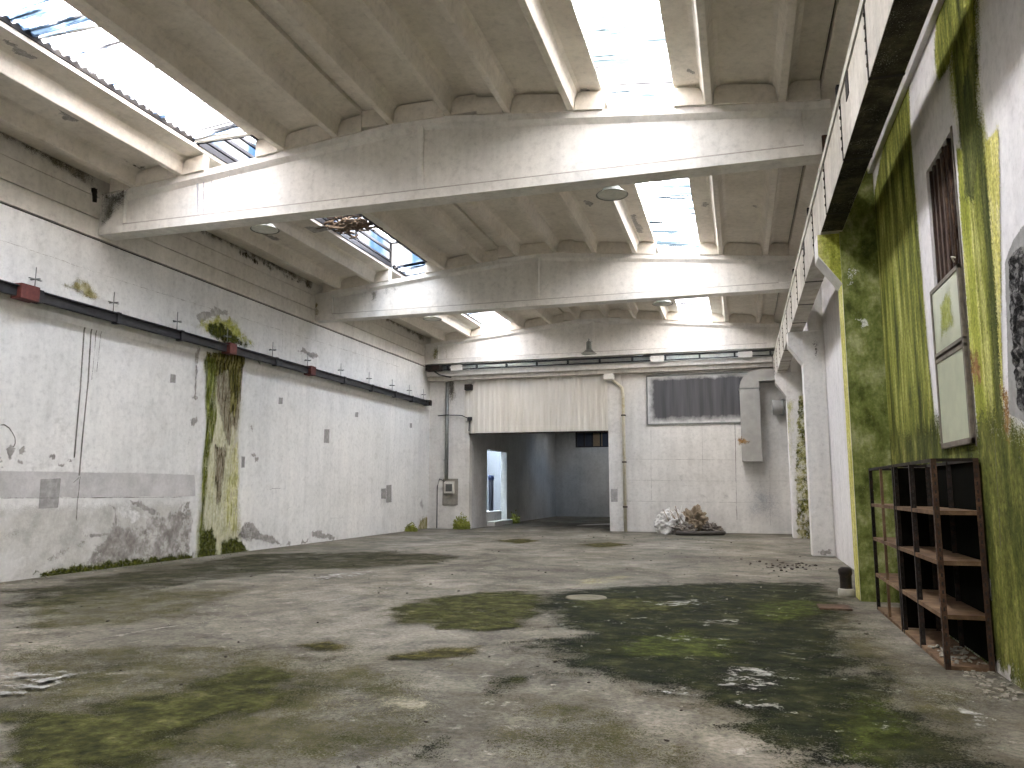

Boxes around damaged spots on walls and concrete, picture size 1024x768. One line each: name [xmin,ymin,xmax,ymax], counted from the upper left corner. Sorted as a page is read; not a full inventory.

leakage [62,277,108,301]
leakage [0,327,458,635]
flaking render [47,501,193,570]
spalling [239,522,335,546]